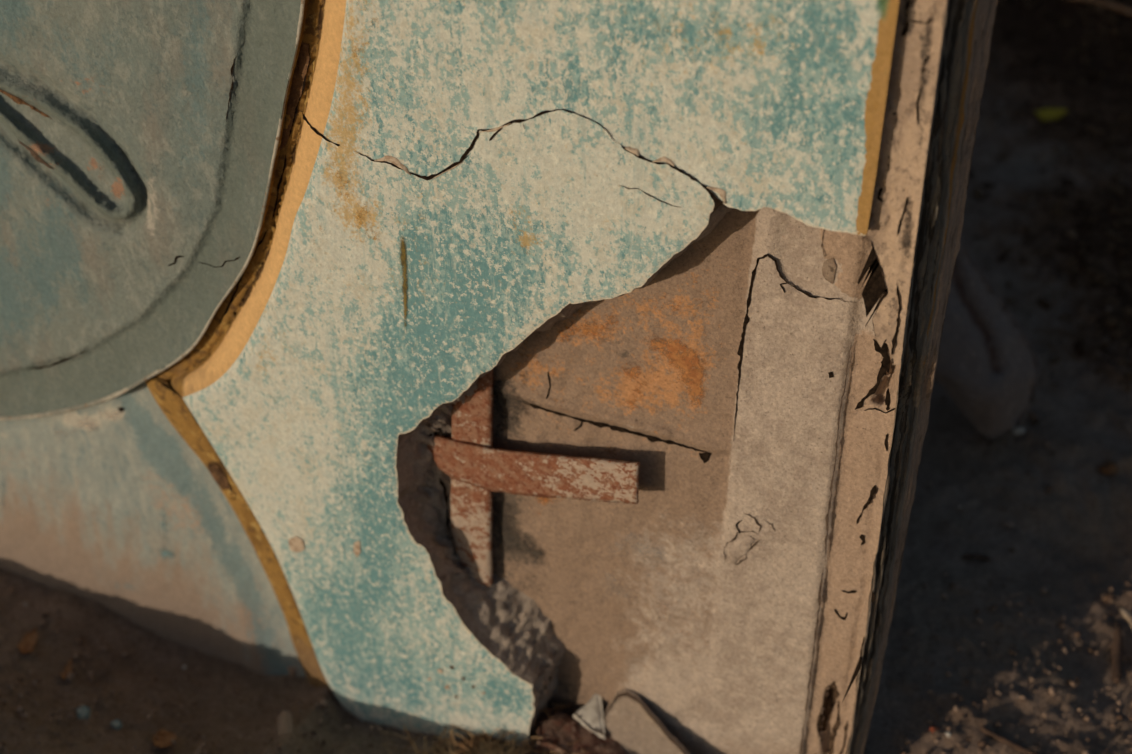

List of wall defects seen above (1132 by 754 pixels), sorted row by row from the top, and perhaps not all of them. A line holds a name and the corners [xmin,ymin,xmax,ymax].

crack [901,0,930,36]
crack [892,56,928,124]
crack [168,46,726,333]
crack [30,350,87,369]
flaking render [396,172,903,754]
crack [523,188,908,754]
crack [439,478,454,542]